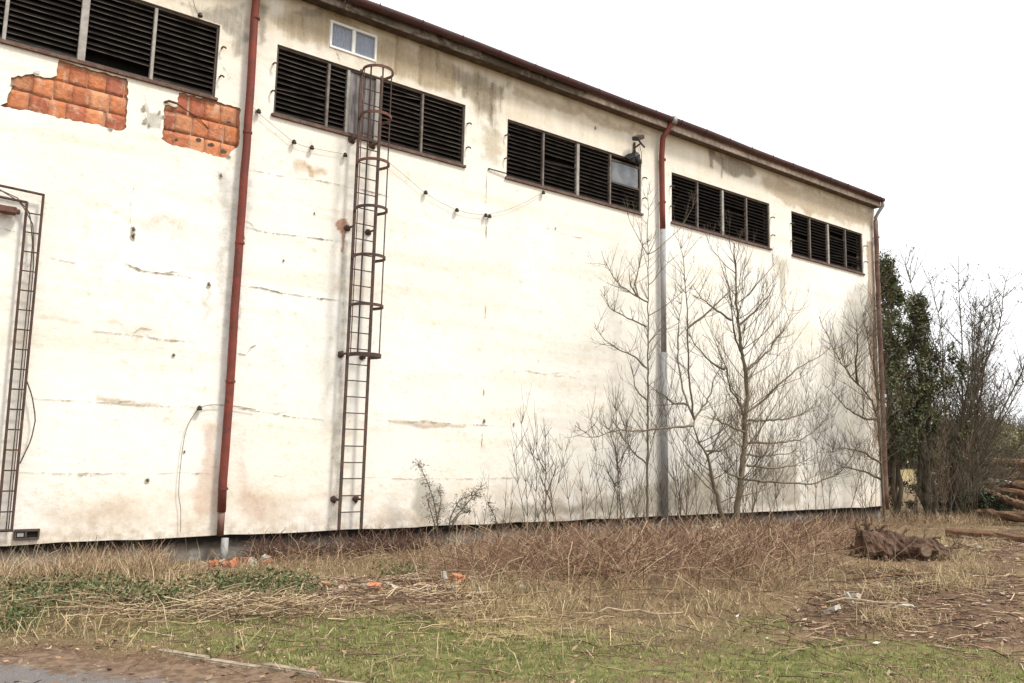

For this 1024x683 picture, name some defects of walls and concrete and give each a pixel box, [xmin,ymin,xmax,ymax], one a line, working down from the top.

spalling [0,60,129,131]
spalling [142,93,241,158]
corrosion [336,219,348,251]